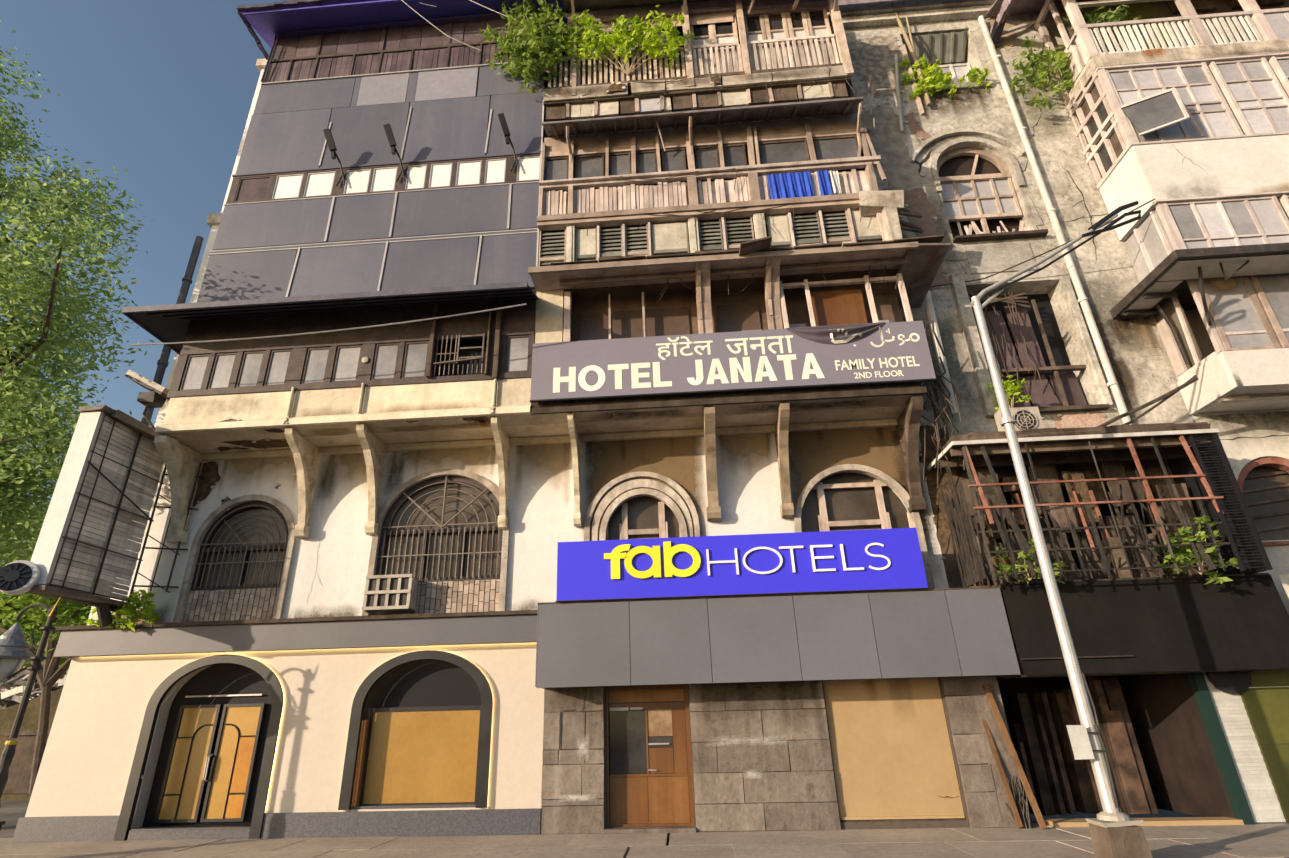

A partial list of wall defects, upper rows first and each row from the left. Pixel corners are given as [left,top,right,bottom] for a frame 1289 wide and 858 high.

spalling [192,460,231,510]